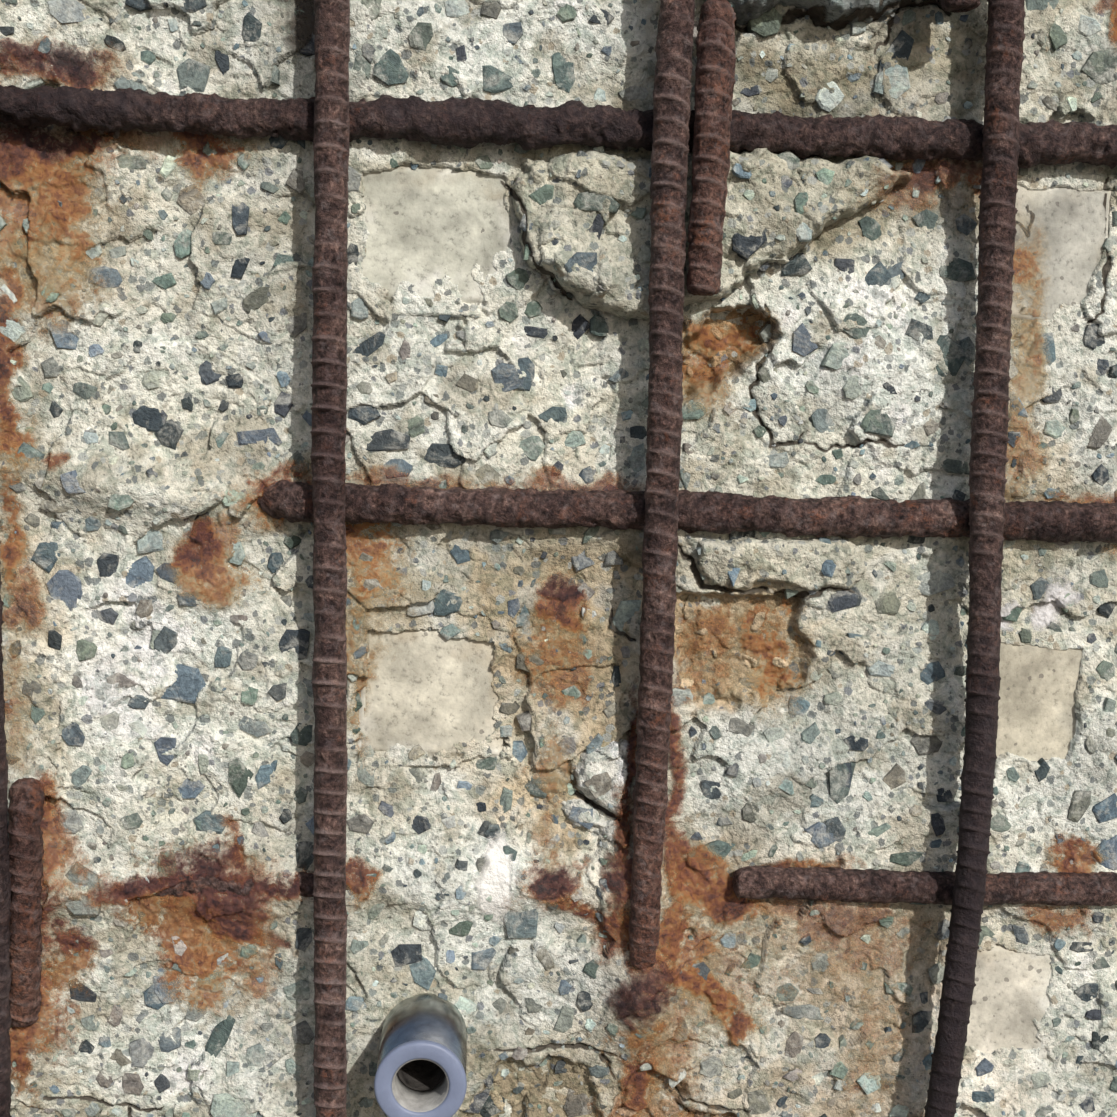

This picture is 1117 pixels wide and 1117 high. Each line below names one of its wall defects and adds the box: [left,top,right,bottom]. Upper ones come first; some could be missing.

corrosion [0,123,130,632]
spalling [77,128,314,412]
crack [501,181,573,301]
crack [749,303,905,452]
corrosion [9,774,97,1096]
spalling [5,615,209,882]
corrosion [85,816,314,1009]
spalling [403,526,770,1117]
crack [567,760,621,820]
corrosion [524,689,890,1117]
crack [678,545,855,600]
spalling [671,535,968,830]